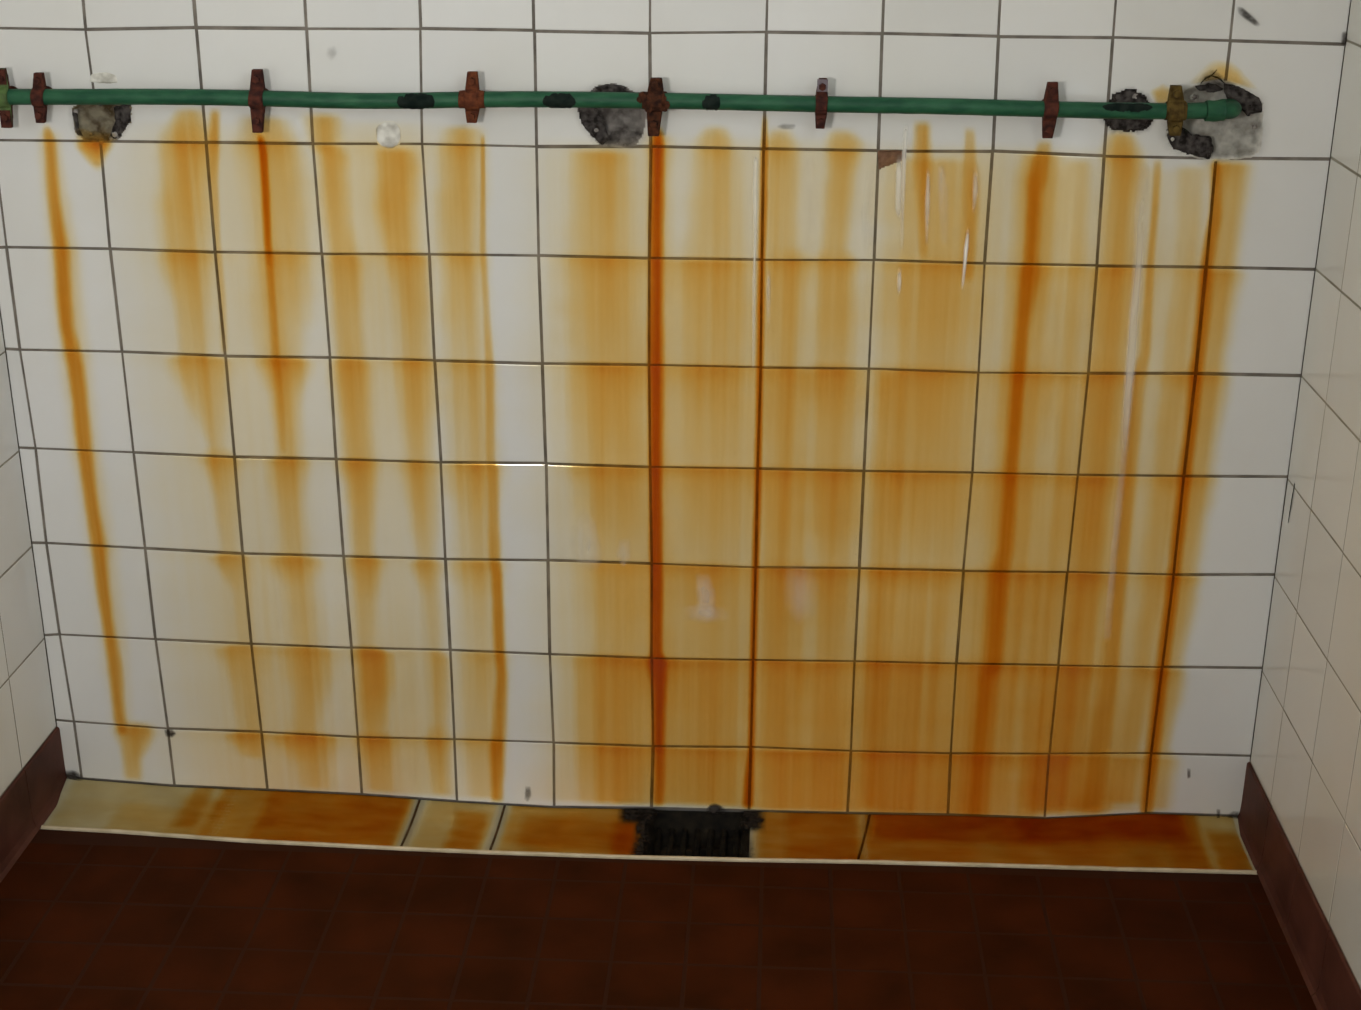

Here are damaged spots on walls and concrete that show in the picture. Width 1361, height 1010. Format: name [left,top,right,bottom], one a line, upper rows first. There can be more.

spalling [72,105,132,145]
spalling [542,93,647,148]
spalling [591,83,633,92]
corrosion [636,92,670,114]
spalling [1102,81,1264,161]